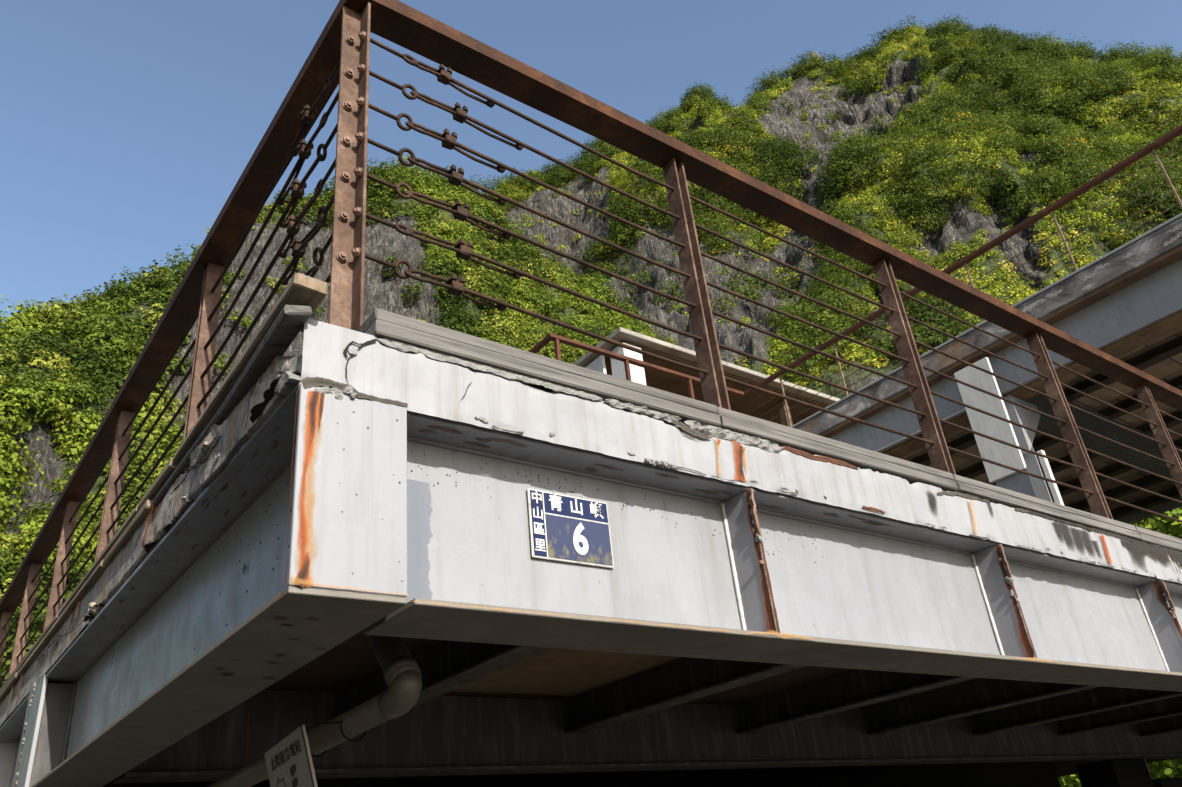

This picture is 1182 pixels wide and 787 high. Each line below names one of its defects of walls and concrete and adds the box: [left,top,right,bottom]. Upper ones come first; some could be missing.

crack [343,339,377,385]
spalling [156,359,408,534]
corrosion [823,506,891,527]
corrosion [36,390,815,784]
corrosion [995,544,1144,671]
corrosion [1155,580,1182,638]